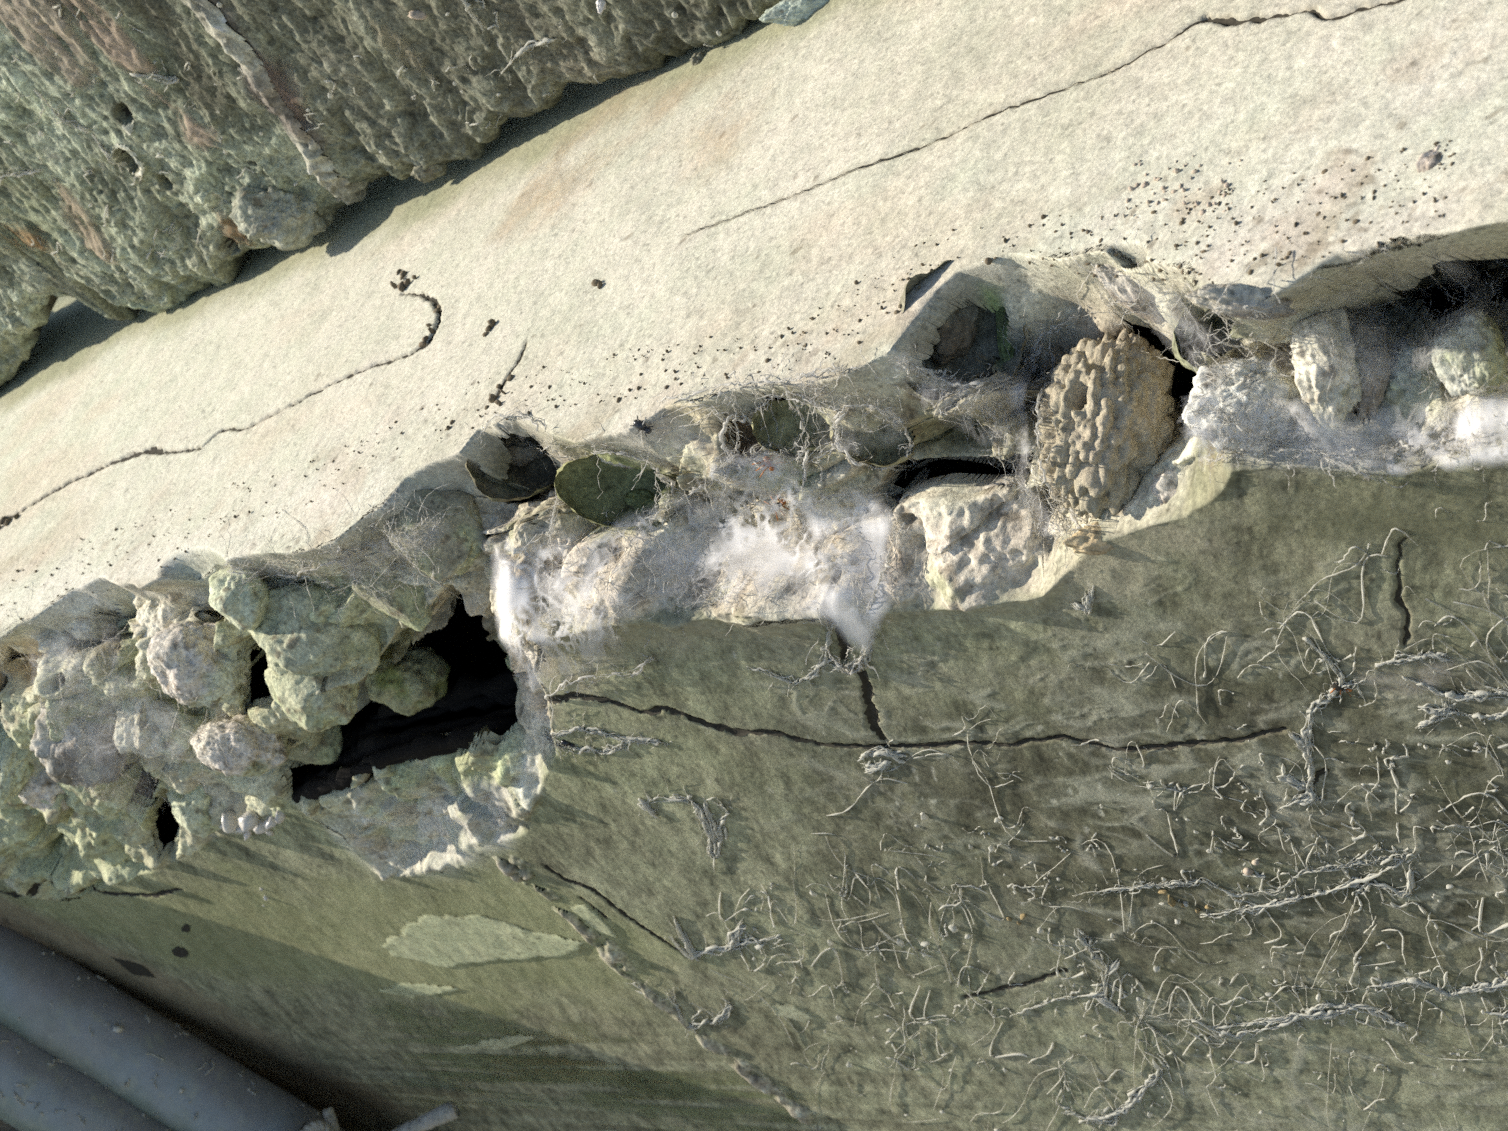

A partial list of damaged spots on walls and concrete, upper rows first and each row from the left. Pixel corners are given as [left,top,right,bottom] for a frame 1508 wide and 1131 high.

crack [685,0,1404,235]
spalling [1415,145,1442,173]
crack [2,293,442,525]
spalling [0,221,1508,902]
crack [548,567,1286,752]
crack [1304,769,1328,797]